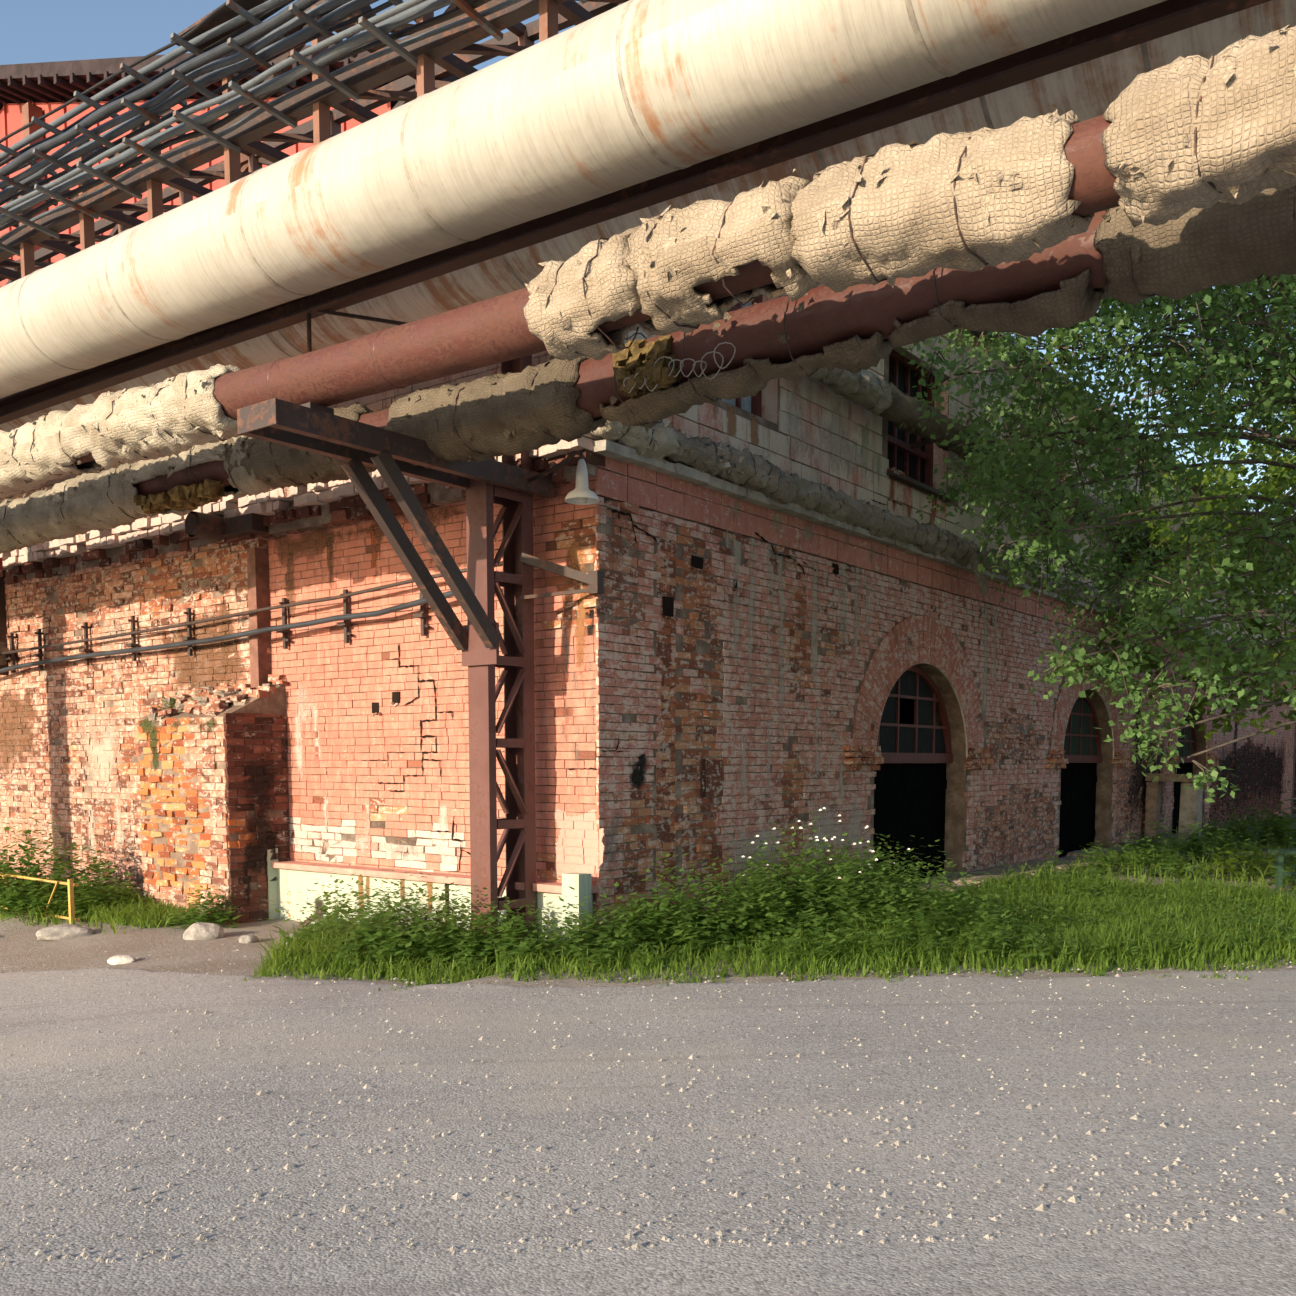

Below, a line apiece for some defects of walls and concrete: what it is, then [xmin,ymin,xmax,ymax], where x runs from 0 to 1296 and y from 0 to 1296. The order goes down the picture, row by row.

crack [363,645,453,792]
spalling [289,797,465,872]
crack [436,817,470,925]